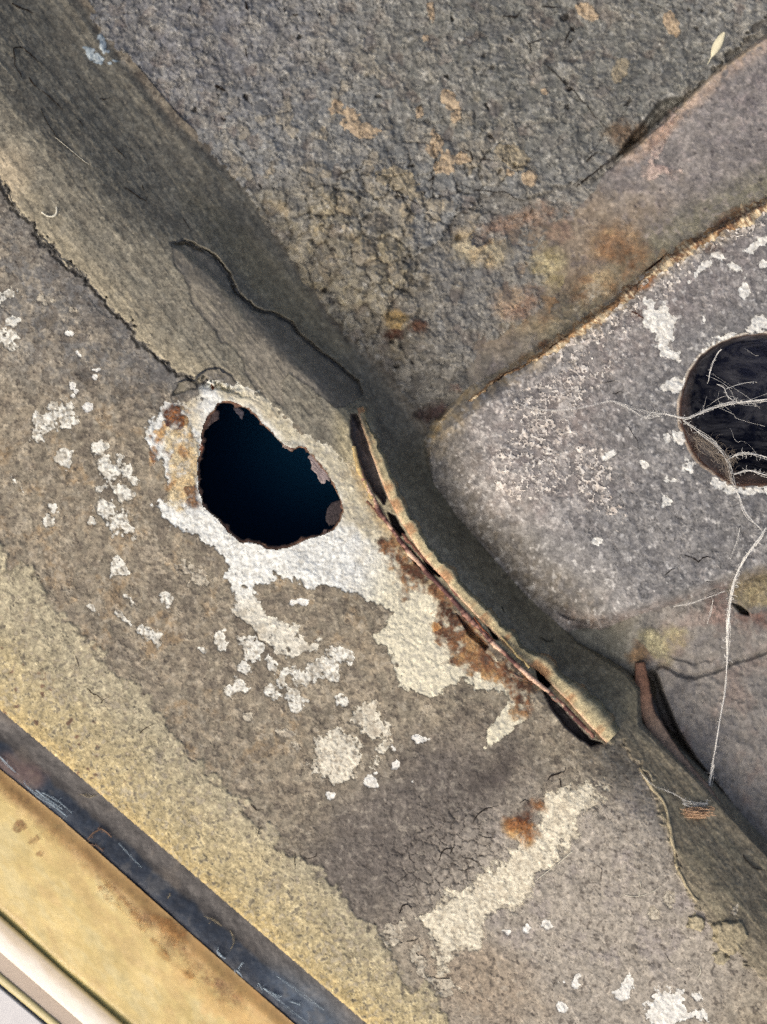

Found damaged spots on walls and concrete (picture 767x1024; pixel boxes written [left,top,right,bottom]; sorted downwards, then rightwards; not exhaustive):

crack [35,231,119,319]
crack [170,218,358,382]
crack [174,367,237,391]
rust [150,404,199,511]
spalling [199,403,342,545]
rust [377,535,537,720]
rust [504,801,543,846]